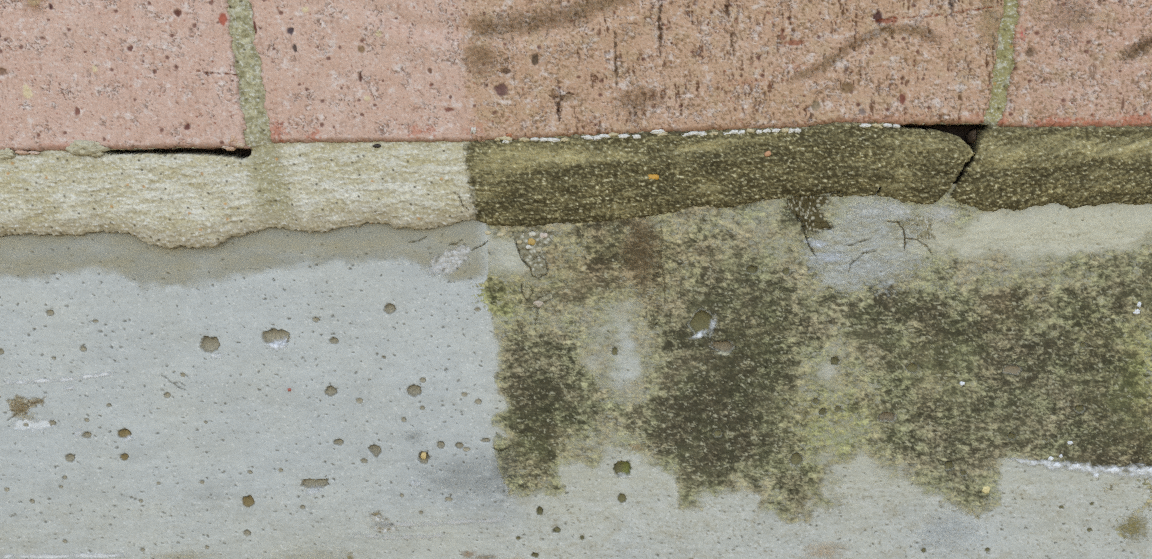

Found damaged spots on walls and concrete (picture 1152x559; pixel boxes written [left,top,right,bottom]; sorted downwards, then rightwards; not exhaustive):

crack [953,156,973,184]
damp [652,405,830,523]
damp [904,441,1152,539]